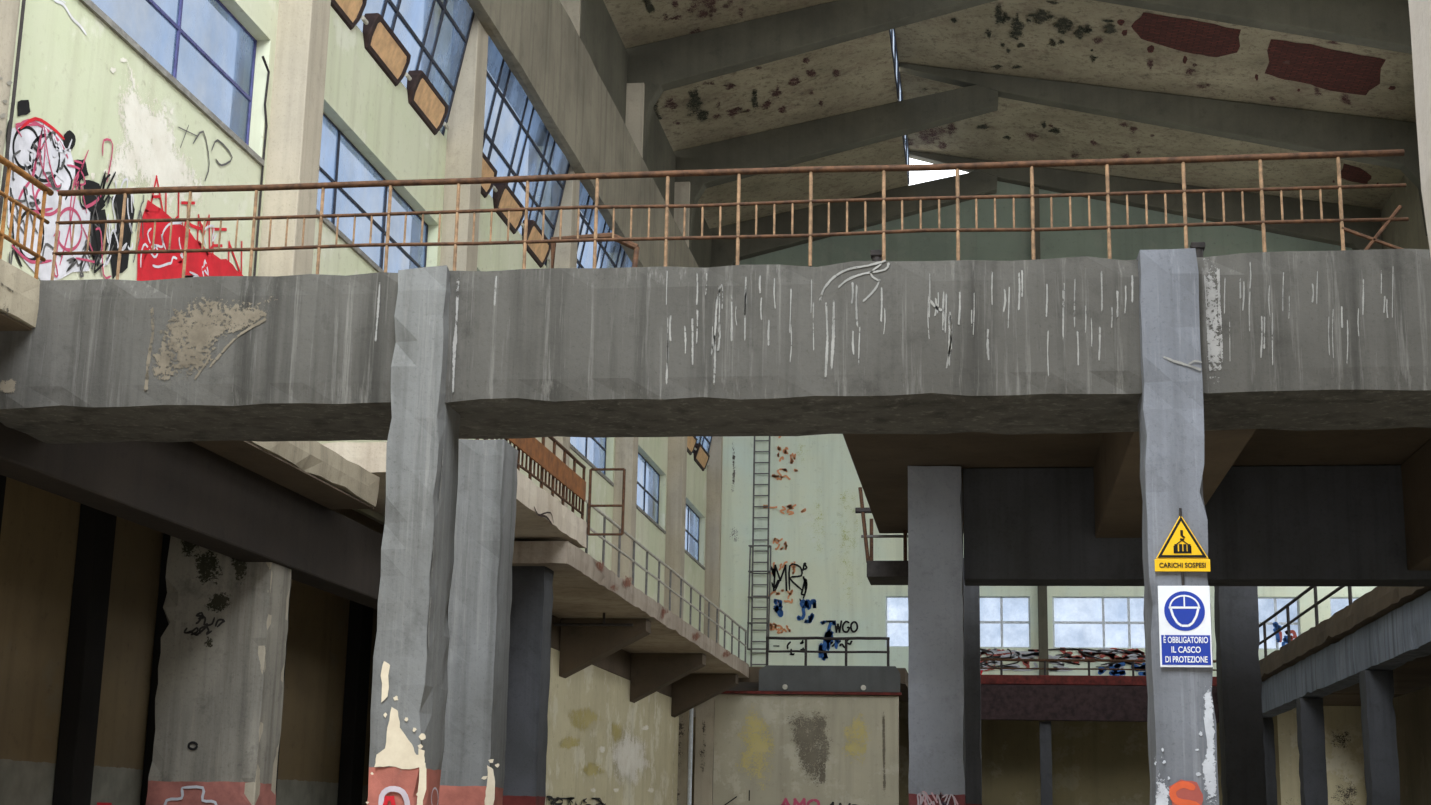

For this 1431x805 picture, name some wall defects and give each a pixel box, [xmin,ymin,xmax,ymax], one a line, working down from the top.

water stain [642,0,743,34]
water stain [653,58,841,125]
water stain [985,0,1117,70]
spalling [1117,12,1241,64]
spalling [1255,39,1396,100]
water stain [204,557,248,613]
peeling [371,661,426,805]
water stain [787,710,886,794]